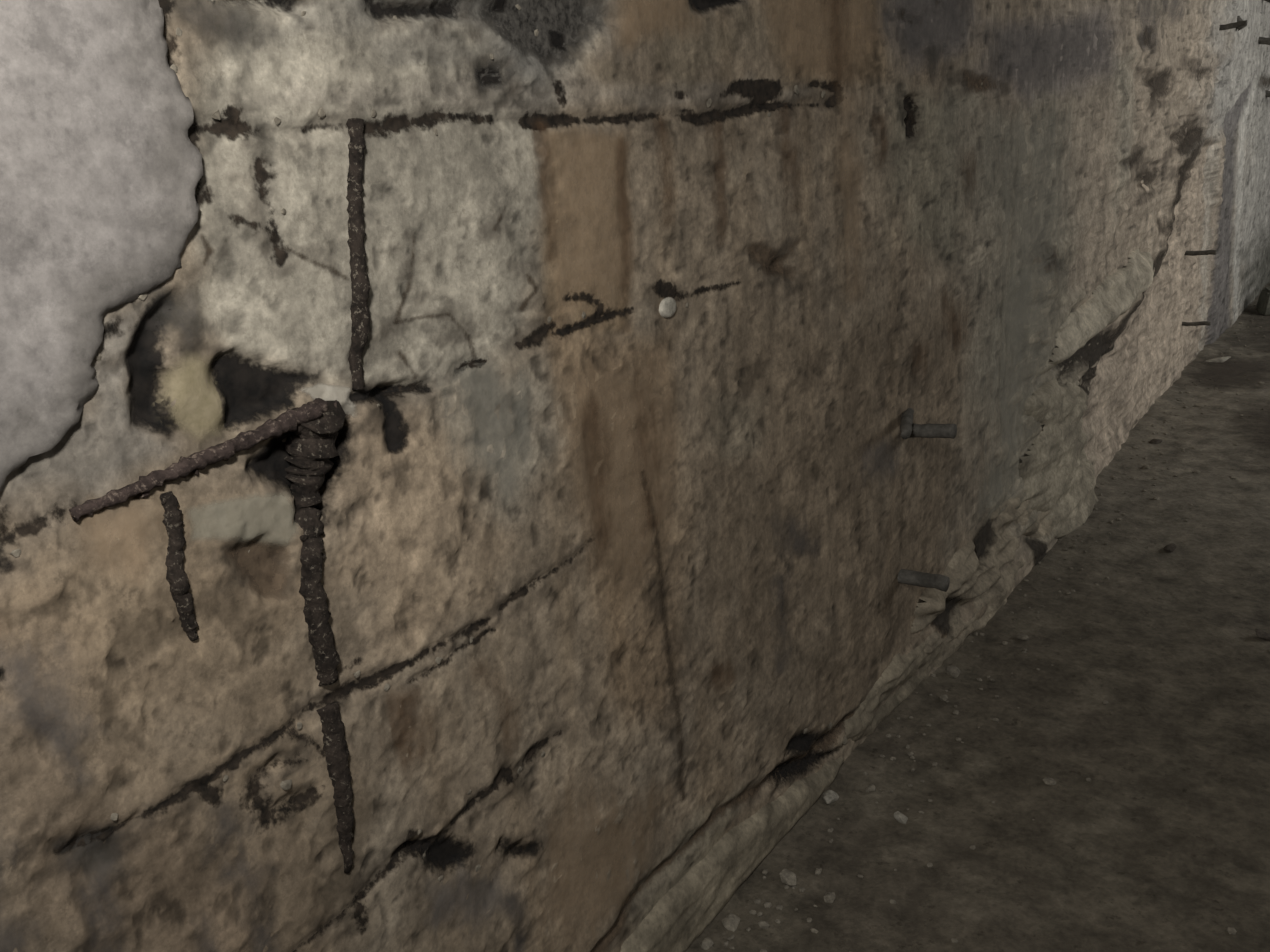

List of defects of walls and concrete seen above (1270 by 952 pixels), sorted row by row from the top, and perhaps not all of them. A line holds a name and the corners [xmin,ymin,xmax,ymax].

spalling [474,54,514,90]
spalling [478,0,601,64]
spalling [69,118,430,686]
spalling [1056,331,1114,389]
crack [53,538,592,853]
spalling [240,701,354,874]
crack [293,731,562,952]